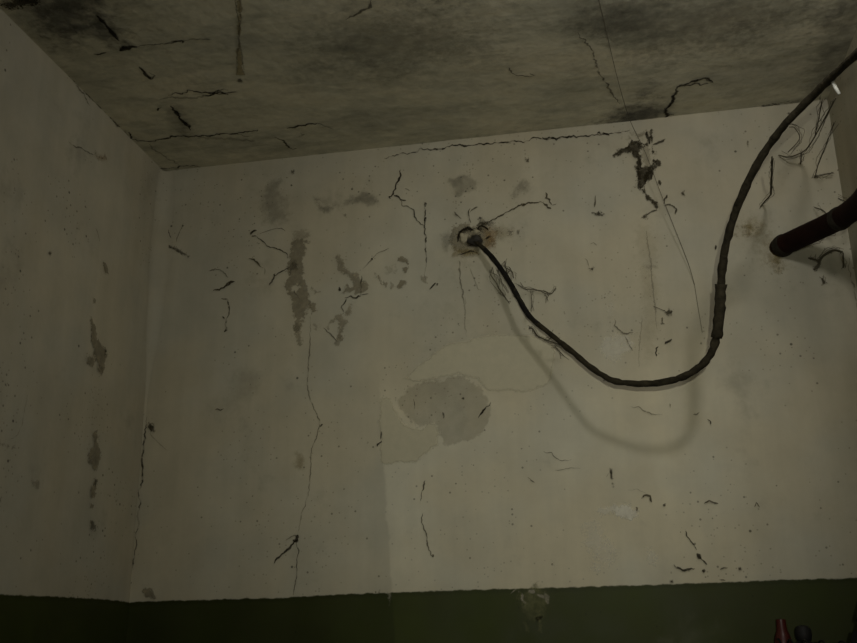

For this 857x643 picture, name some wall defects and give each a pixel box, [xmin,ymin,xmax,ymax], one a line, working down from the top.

crack [95,15,210,80]
crack [69,76,317,150]
crack [664,78,713,118]
crack [385,130,629,263]
flaking render [613,129,677,218]
crack [249,228,288,285]
flaking render [449,207,495,255]
crack [210,269,235,332]
flaking render [87,319,107,373]
crack [274,328,336,595]
crack [420,481,434,557]
crack [674,532,726,581]